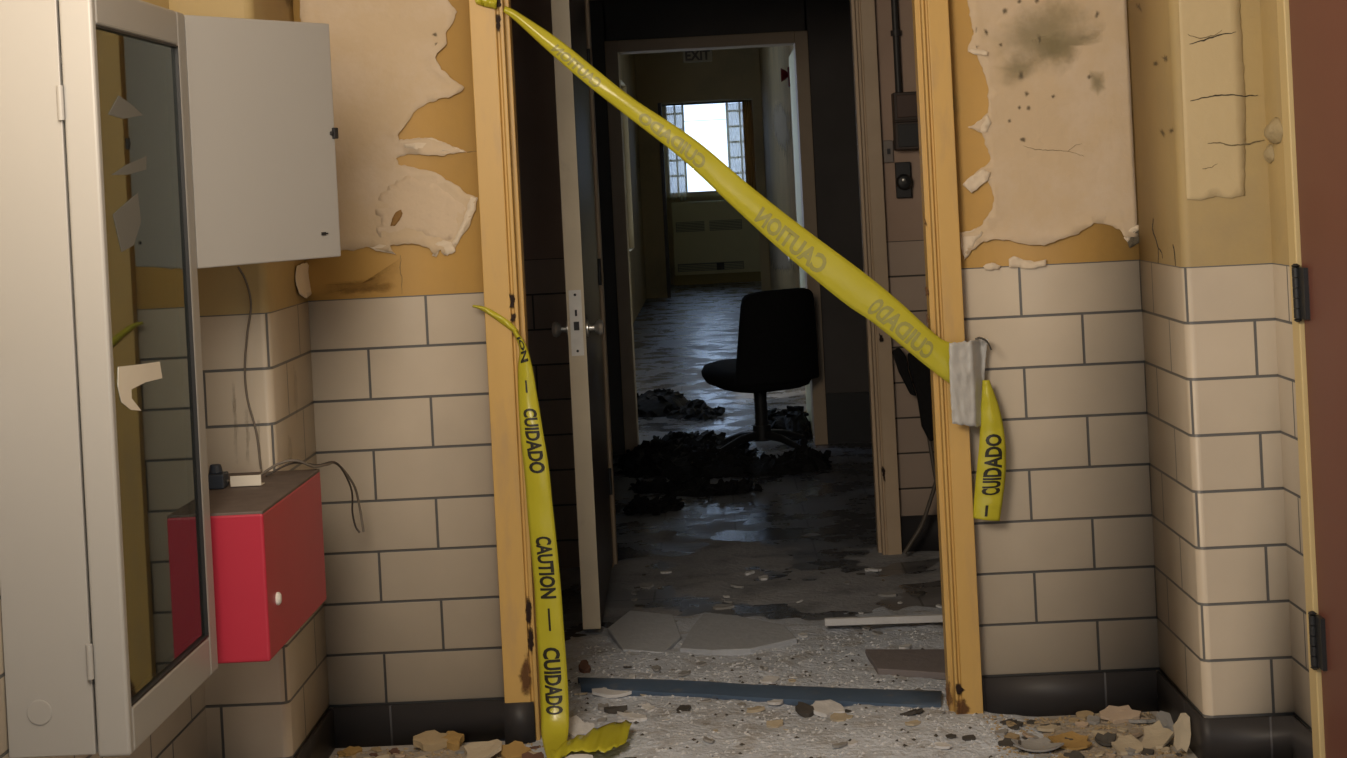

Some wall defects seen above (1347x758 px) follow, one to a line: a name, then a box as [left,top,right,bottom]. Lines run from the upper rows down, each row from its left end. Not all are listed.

crack [1188,30,1234,44]
crack [1191,93,1258,101]
peeling [300,0,478,257]
peeling [960,0,1139,271]
crack [1203,140,1264,169]